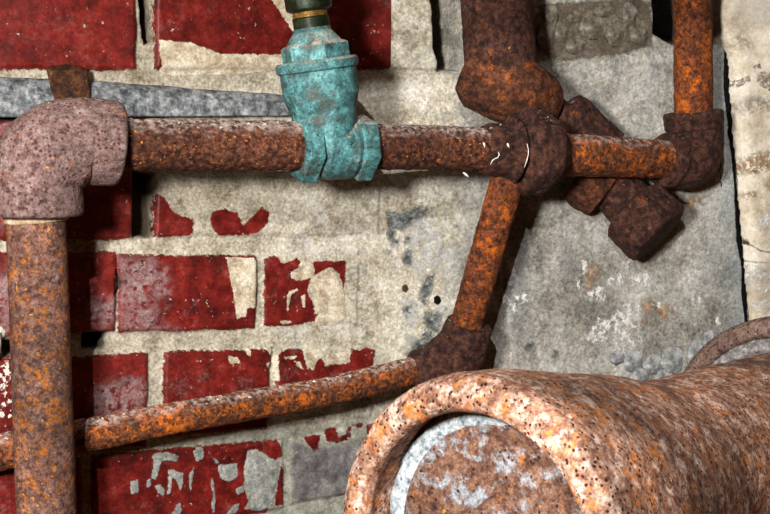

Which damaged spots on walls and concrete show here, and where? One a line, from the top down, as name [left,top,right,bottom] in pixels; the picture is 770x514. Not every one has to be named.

peeling [272,0,294,31]
peeling [159,40,283,76]
peeling [225,257,257,319]
peeling [130,446,280,513]